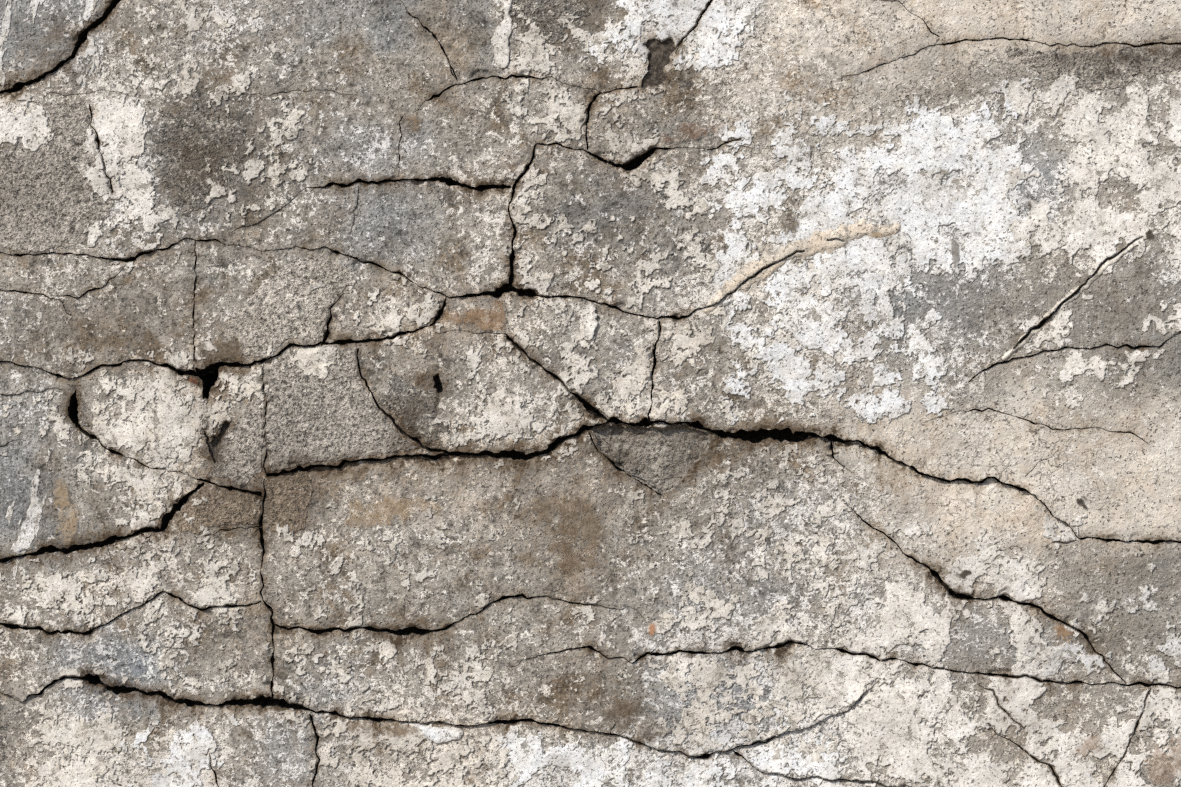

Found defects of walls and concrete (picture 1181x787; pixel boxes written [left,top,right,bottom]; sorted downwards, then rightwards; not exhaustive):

crack [0,0,141,193]
crack [401,1,458,81]
crack [675,0,713,53]
crack [839,0,1181,81]
crack [0,74,804,379]
crack [969,237,1180,382]
crack [0,321,1181,787]